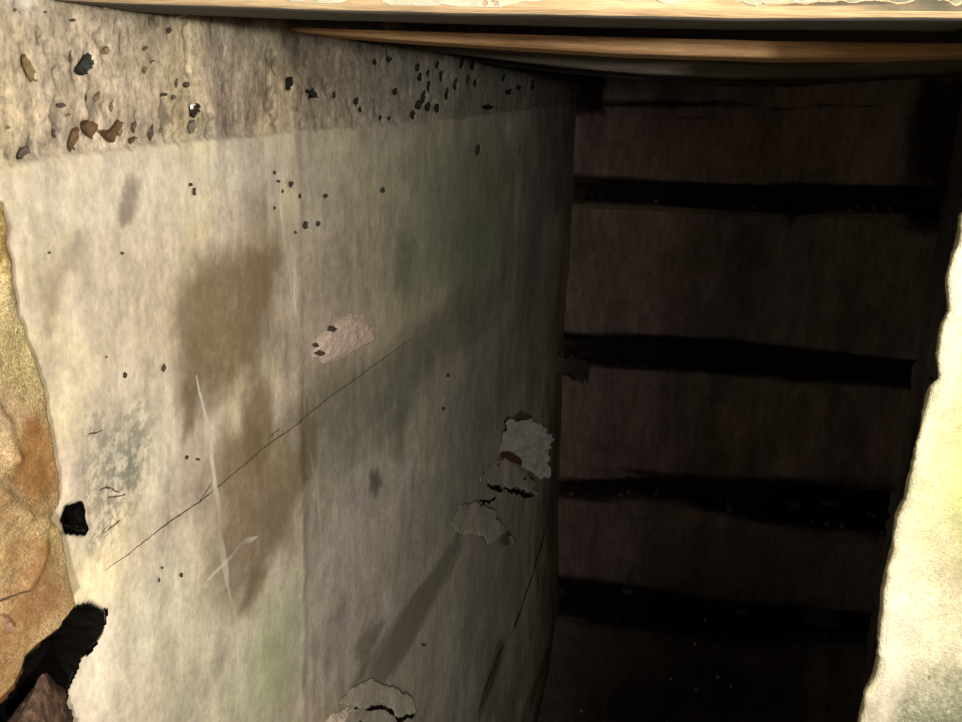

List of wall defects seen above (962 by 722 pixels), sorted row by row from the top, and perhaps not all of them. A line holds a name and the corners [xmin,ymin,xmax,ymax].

water stain [188,251,277,393]
spalling [311,313,378,364]
crack [99,486,126,534]
crack [106,338,413,570]
water stain [219,390,301,586]
flaking render [452,500,515,546]
flaking render [480,418,555,496]
flaking render [326,678,416,722]